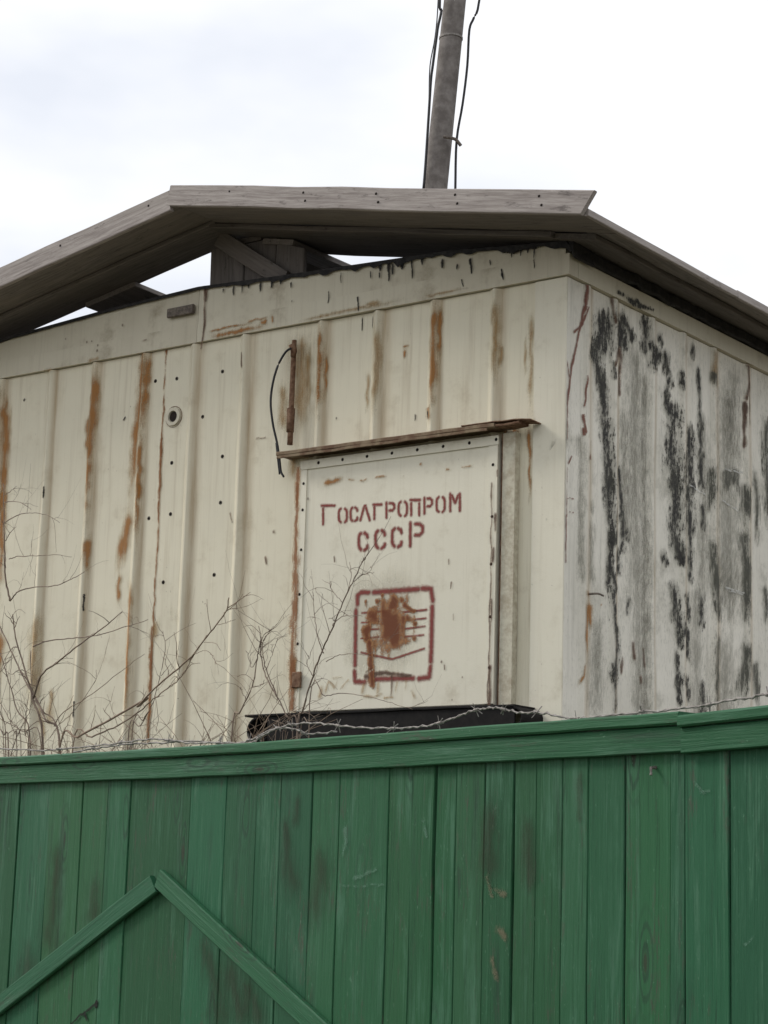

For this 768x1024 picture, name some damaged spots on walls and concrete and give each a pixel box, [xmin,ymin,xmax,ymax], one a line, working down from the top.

rust [0,393,11,580]
rust [83,540,92,568]
rust [85,374,100,509]
rust [117,577,133,709]
rust [118,353,151,559]
rust [288,459,308,712]
rust [280,333,328,425]
rust [366,335,380,403]
rust [361,593,417,691]
rust [427,310,442,418]
rust [491,308,503,362]
leakage [589,290,768,713]